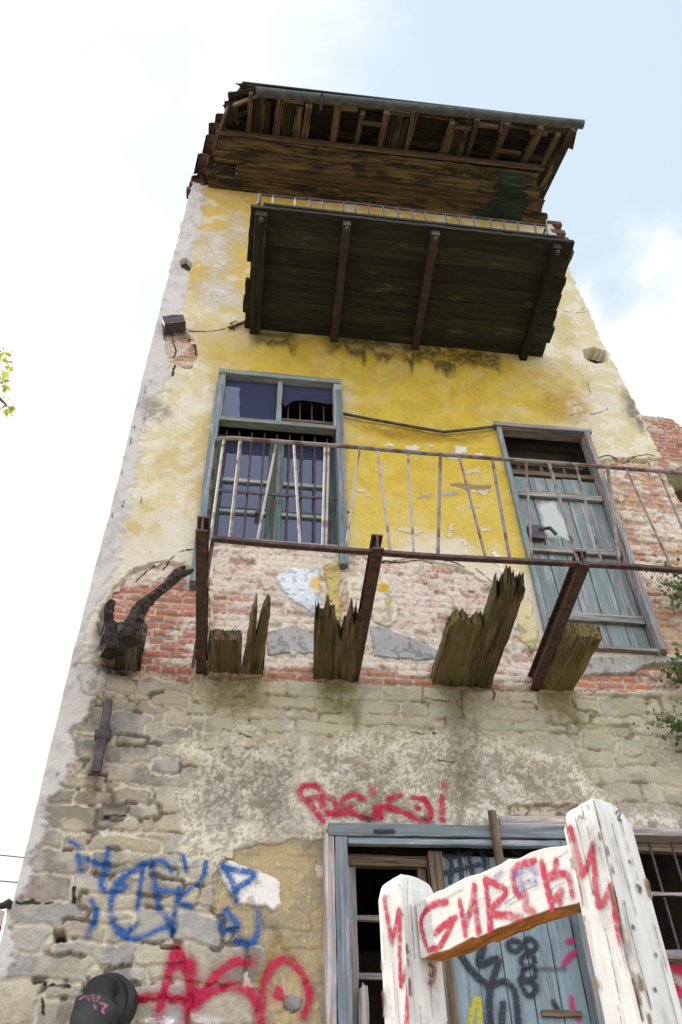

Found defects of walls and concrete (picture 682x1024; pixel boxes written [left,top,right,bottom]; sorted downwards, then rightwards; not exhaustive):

flaking render [164,332,198,369]
leakage [334,338,390,362]
leakage [402,345,498,375]
flaking render [418,446,492,507]
crack [136,548,193,581]
flaking render [575,461,682,696]
flaking render [112,544,541,693]